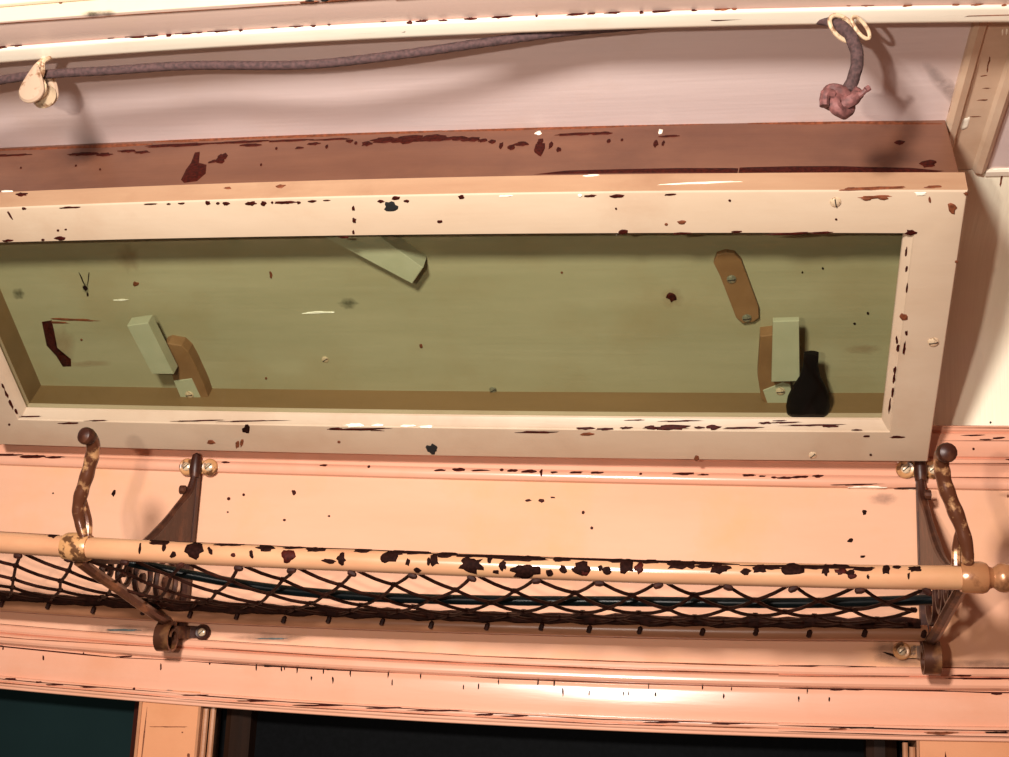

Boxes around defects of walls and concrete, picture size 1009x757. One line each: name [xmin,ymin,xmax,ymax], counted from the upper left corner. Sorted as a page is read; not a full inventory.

peeling [434,468,558,477]
peeling [138,540,921,579]